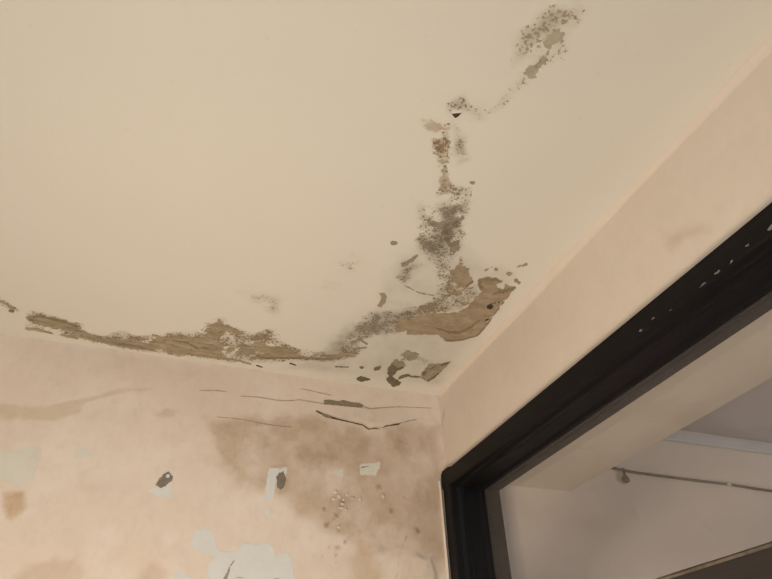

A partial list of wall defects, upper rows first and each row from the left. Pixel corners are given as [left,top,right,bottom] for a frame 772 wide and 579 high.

peeling [517,4,585,89]
peeling [395,203,528,342]
crack [0,300,16,313]
peeling [25,311,360,368]
spalling [357,350,450,387]
crack [199,389,423,409]
crack [221,417,292,427]
spalling [149,470,173,498]
spalling [264,467,287,516]
peeling [359,461,380,476]
peeling [190,527,296,579]